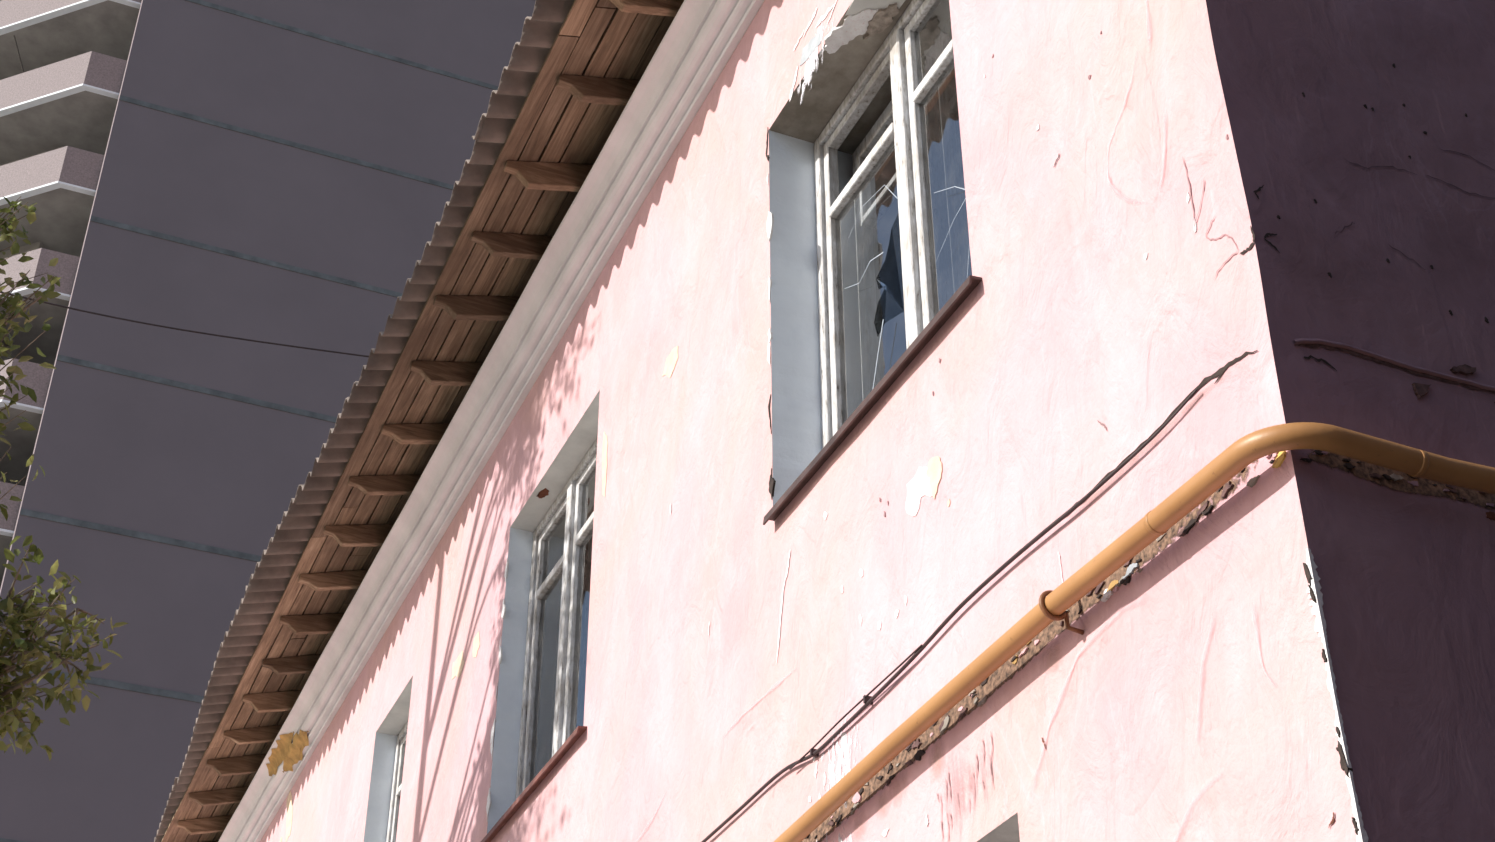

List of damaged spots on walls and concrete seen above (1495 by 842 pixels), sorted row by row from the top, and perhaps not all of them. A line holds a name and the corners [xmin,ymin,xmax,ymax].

flaking render [789,0,905,103]
peeling [766,211,774,242]
flaking render [801,450,1495,842]
flaking render [266,730,309,777]